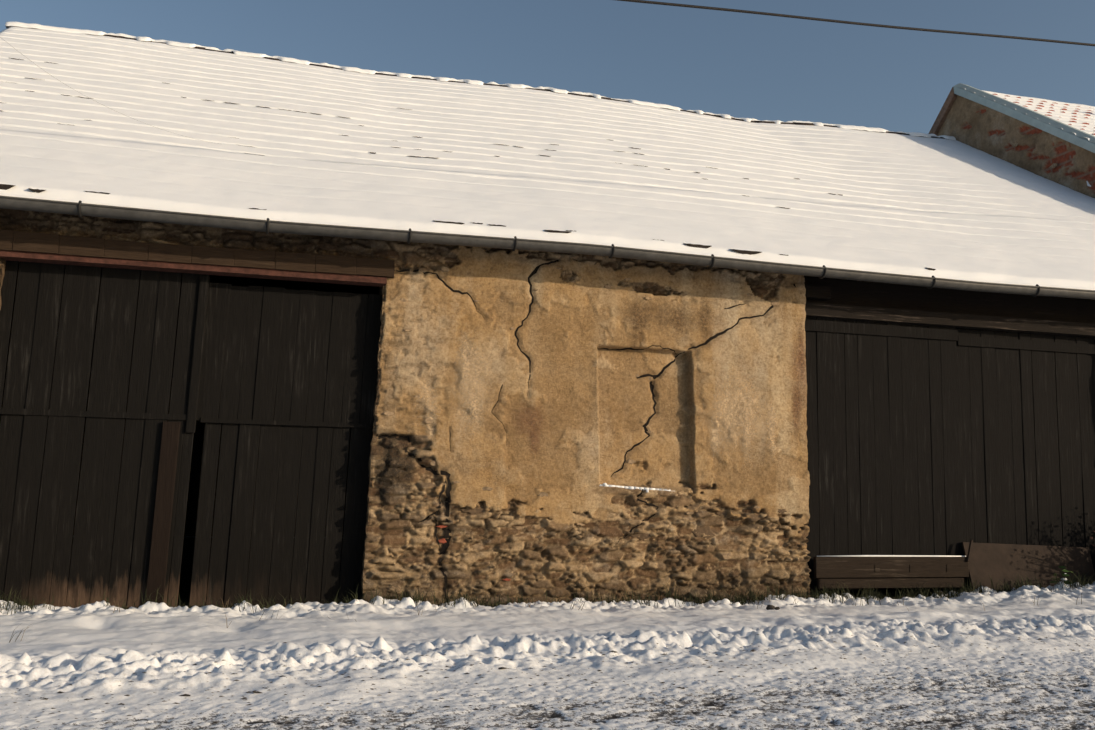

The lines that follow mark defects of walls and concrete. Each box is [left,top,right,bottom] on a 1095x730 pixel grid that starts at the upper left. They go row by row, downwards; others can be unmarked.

flaking render [0,208,21,231]
crack [376,433,460,598]
flaking render [373,240,496,273]
crack [394,267,483,316]
crack [492,260,559,439]
flaking render [362,286,811,606]
crack [618,489,659,542]
crack [599,304,773,477]